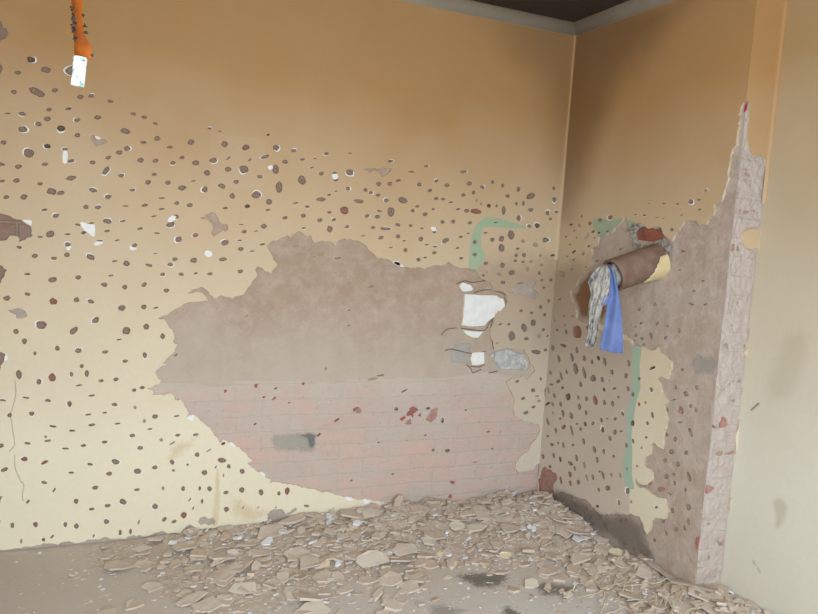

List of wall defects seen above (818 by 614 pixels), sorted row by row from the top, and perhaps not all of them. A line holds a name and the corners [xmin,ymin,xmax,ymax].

spalling [29,87,58,97]
spalling [4,108,52,133]
spalling [0,147,34,183]
spalling [61,147,75,164]
spalling [101,146,132,178]
spalling [0,214,54,249]
spalling [75,218,126,260]
spalling [3,296,27,318]
crack [456,280,524,303]
spalling [132,102,765,614]
crack [441,318,497,373]